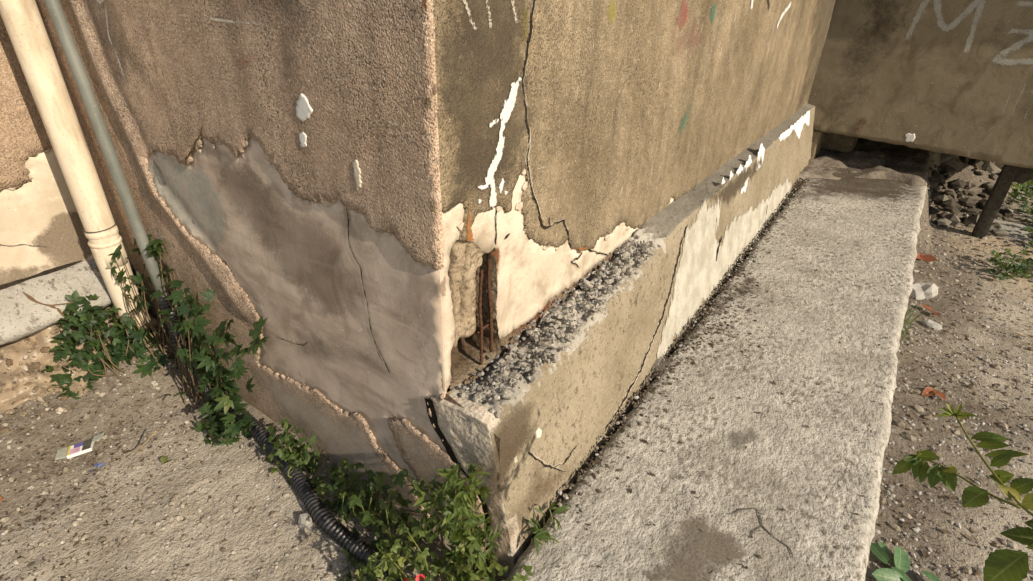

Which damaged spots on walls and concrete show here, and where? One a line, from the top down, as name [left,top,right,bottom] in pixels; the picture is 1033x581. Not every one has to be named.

crack [0,244,83,318]
peeling [0,148,94,279]
crack [346,208,391,373]
peeling [147,137,639,537]
crack [495,209,510,243]
crack [521,0,607,268]
crack [606,225,688,428]
crack [424,398,491,566]
crack [529,446,577,472]